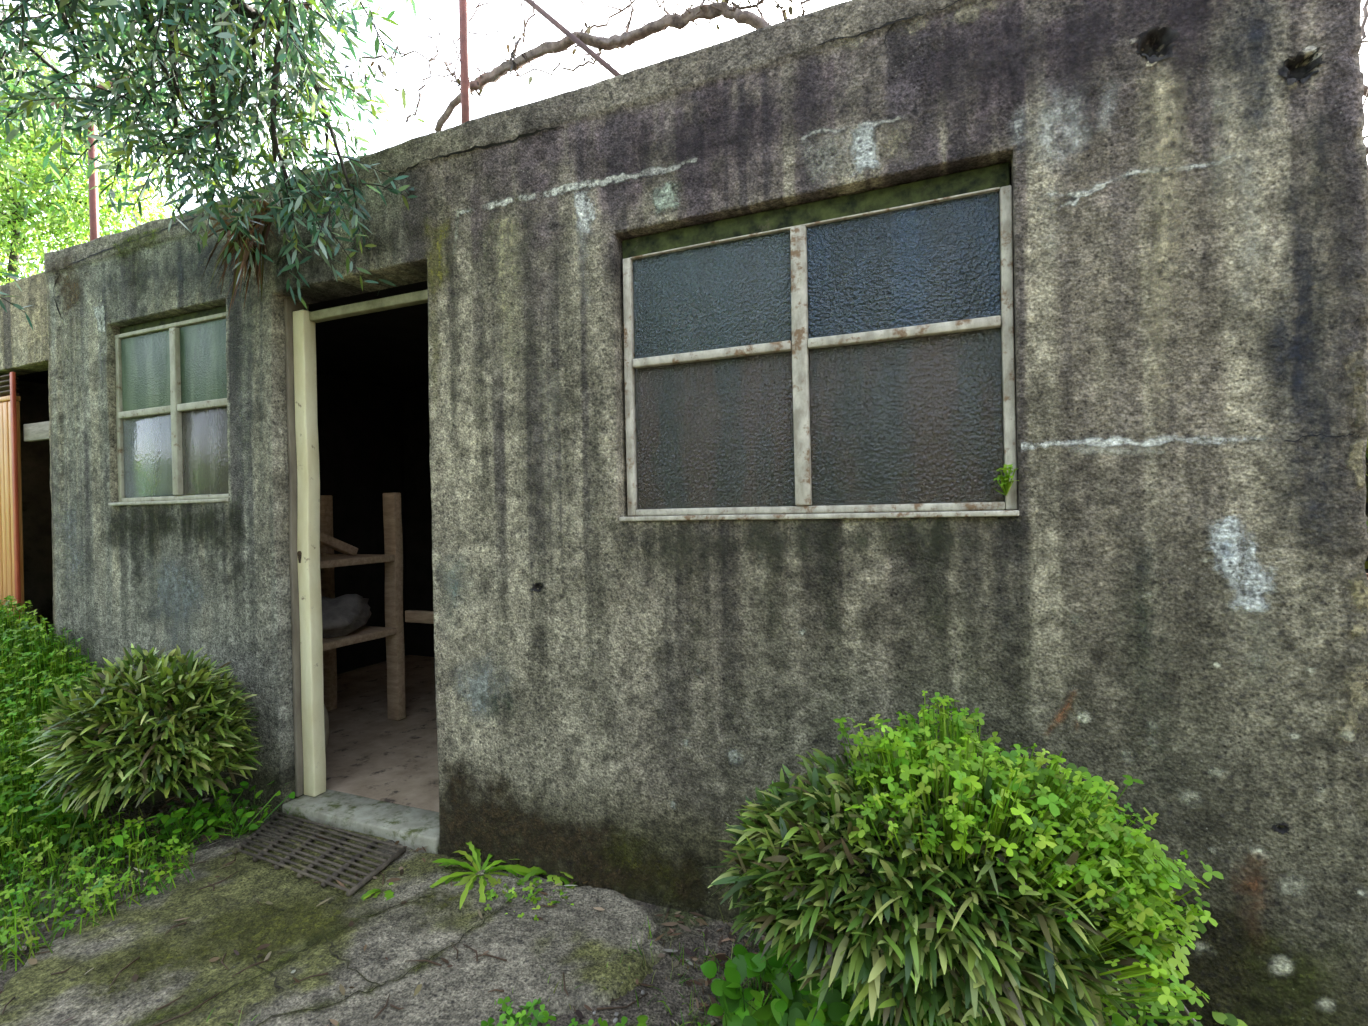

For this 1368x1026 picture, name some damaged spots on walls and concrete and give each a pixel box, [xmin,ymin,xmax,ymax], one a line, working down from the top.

spalling [1129,26,1180,67]
spalling [1278,45,1326,88]
damp [653,183,678,211]
damp [1021,436,1258,454]
damp [1211,516,1273,612]